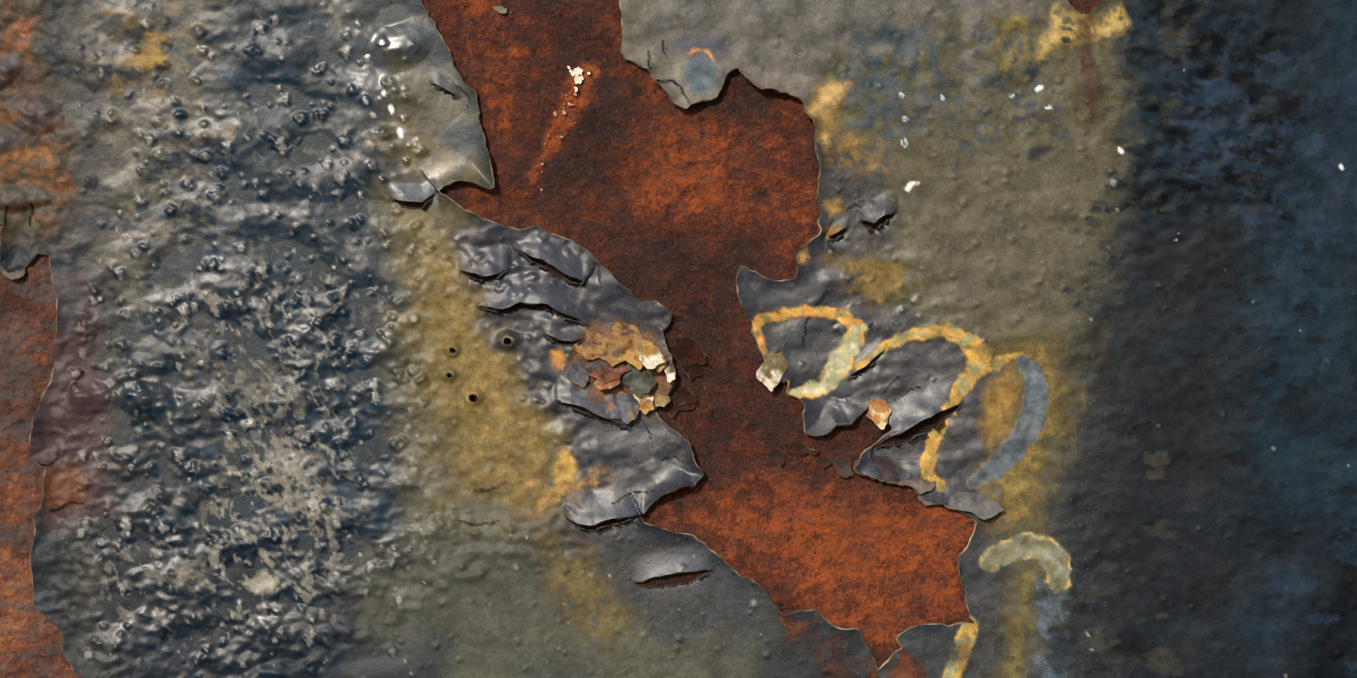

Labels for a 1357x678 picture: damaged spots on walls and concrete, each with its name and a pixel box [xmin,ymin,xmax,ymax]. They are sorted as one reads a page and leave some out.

rust [12,20,33,50]
water stain [133,31,168,69]
water stain [993,7,1128,69]
rust [0,145,73,204]
peeling [421,0,1004,669]
water stain [213,363,303,433]
rust [572,323,670,415]
peeling [0,187,82,678]
water stain [253,449,337,545]
water stain [243,570,279,594]
rust [869,653,924,678]